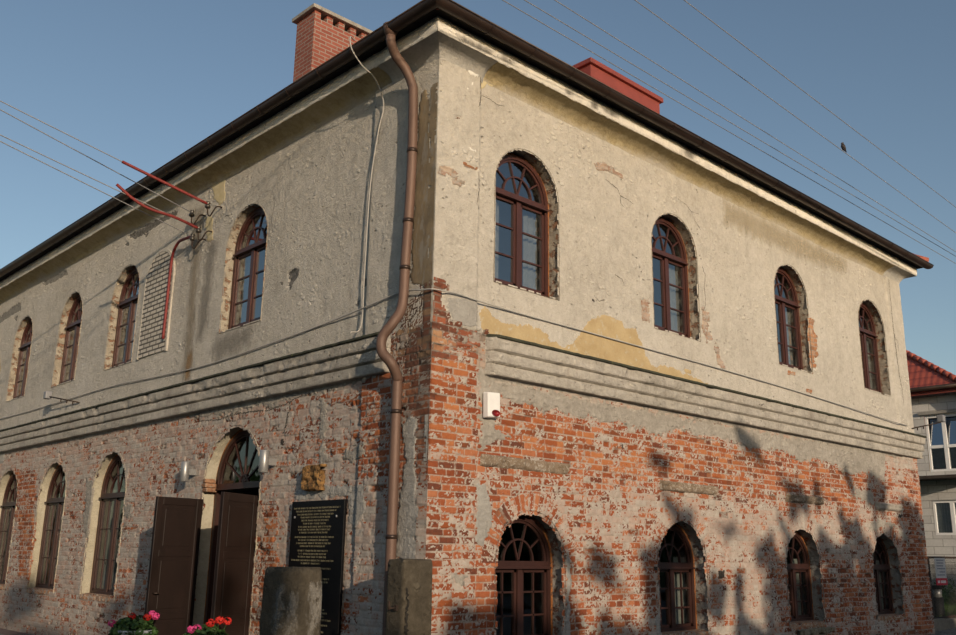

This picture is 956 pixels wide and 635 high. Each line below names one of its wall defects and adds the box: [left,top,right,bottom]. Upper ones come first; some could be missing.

flaking render [390,82,887,521]
spalling [189,375,384,464]
spalling [14,468,38,581]
flaking render [82,475,95,541]
flaking render [294,484,366,528]
spalling [432,573,468,609]